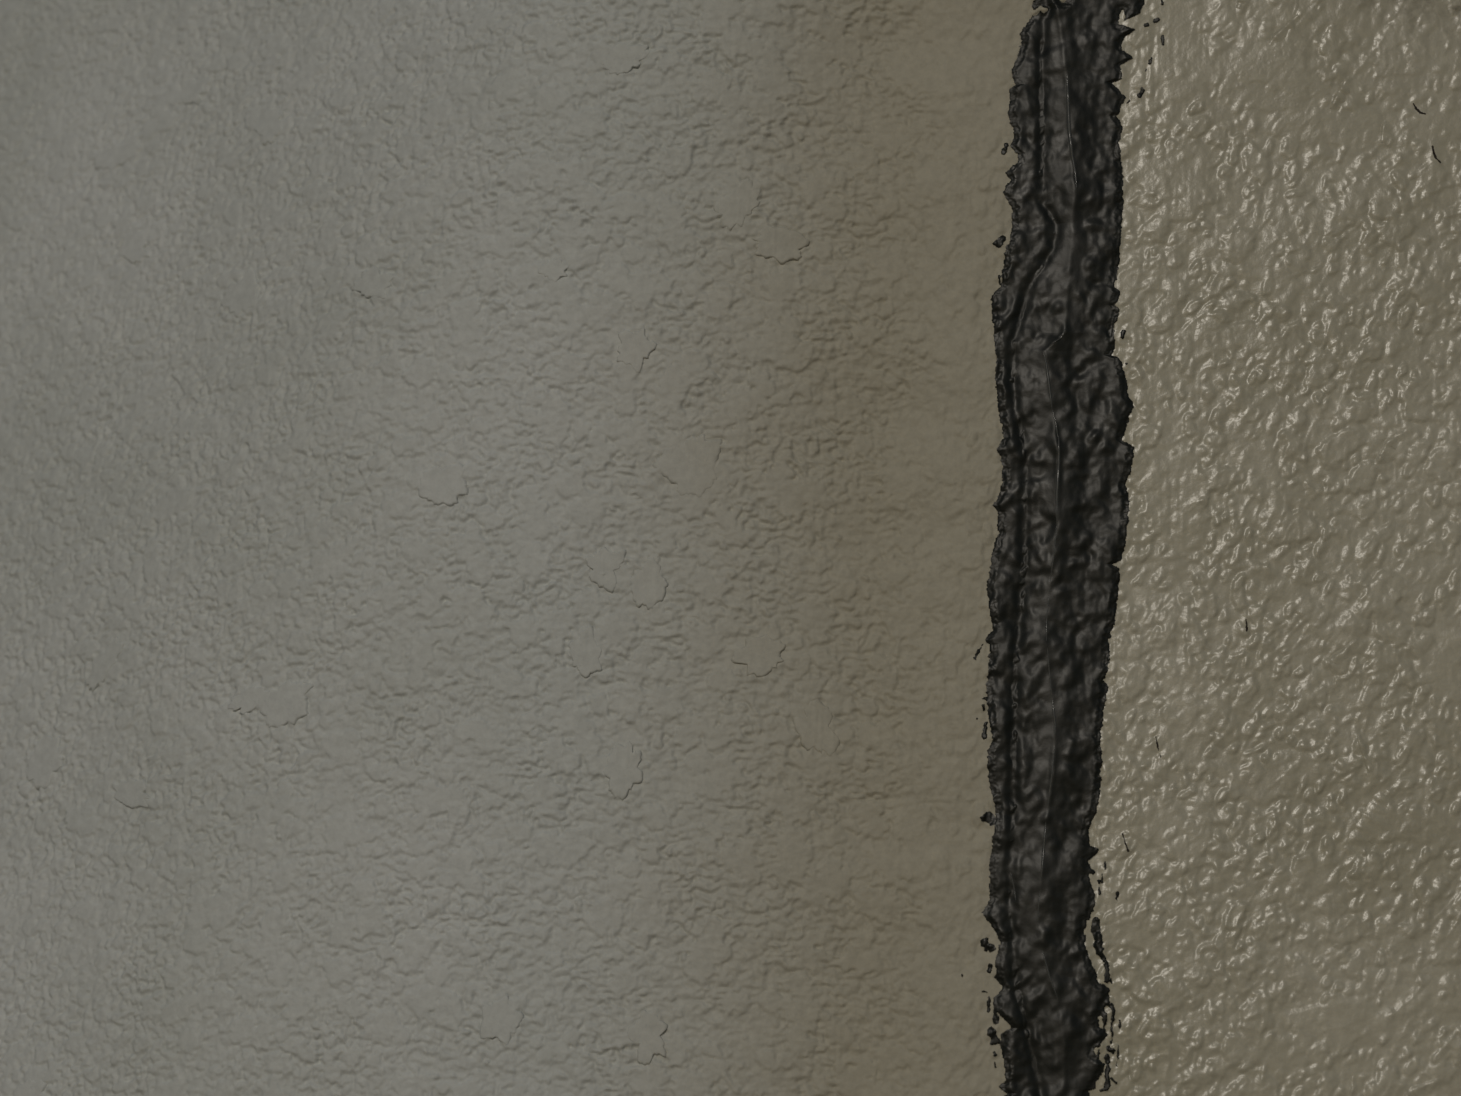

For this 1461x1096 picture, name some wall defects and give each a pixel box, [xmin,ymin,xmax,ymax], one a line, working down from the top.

crack [961,0,1165,1096]